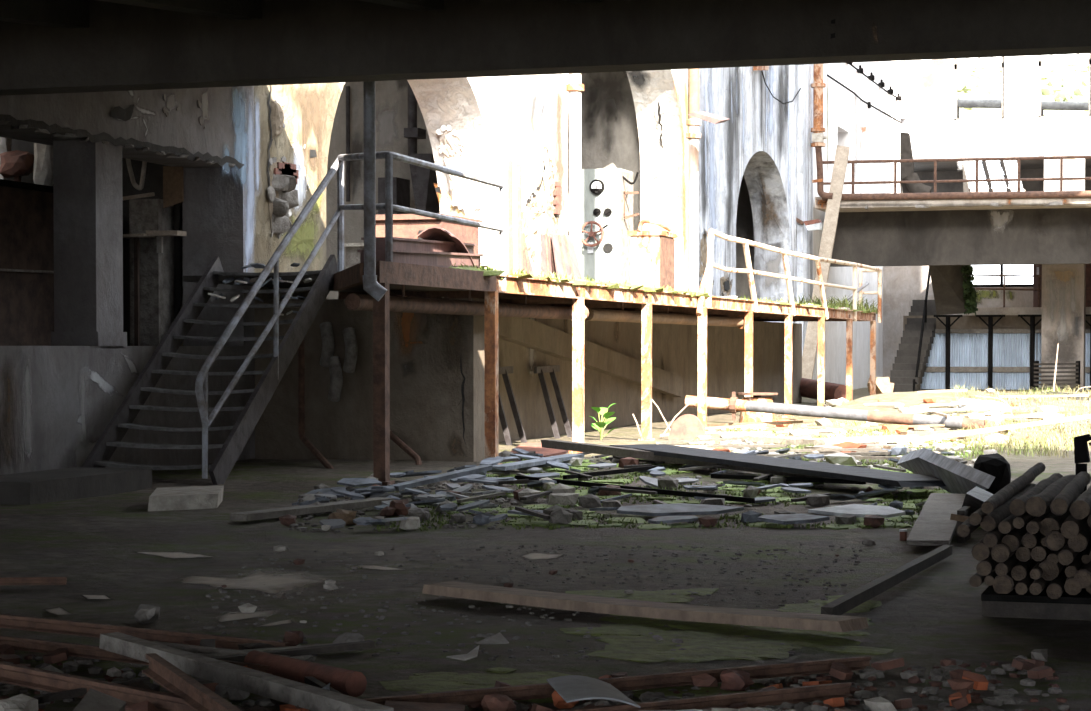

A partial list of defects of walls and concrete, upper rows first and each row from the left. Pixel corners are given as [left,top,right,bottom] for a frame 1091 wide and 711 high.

peeling [436,125,466,159]
crack [658,102,670,163]
spalling [522,146,562,262]
water stain [705,65,795,287]
rust [510,443,569,457]